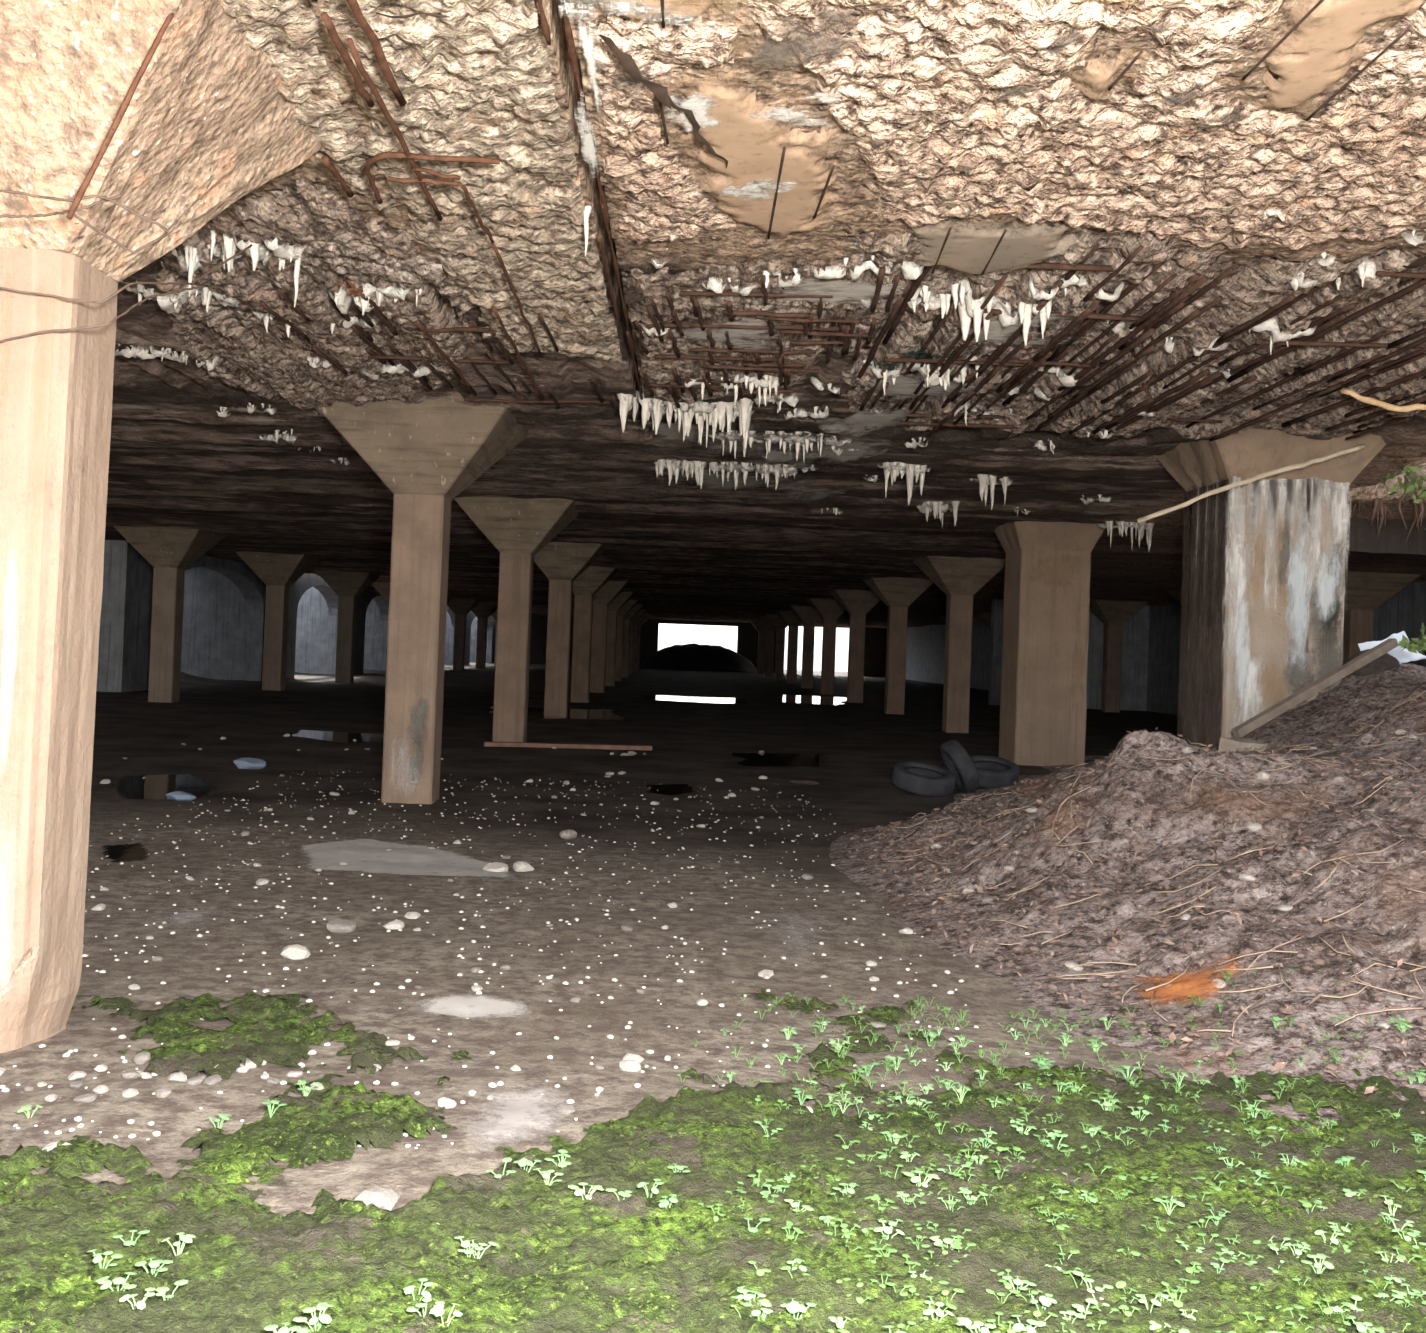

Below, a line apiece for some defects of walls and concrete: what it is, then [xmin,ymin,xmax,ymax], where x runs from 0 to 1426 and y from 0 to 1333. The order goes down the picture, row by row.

rust [537,0,643,400]
spalling [146,0,1426,441]
leakage [114,344,220,371]
leakage [124,229,307,338]
leakage [307,356,332,369]
leakage [323,280,426,334]
leakage [360,363,432,380]
leakage [616,254,1128,526]
leakage [1105,320,1136,334]
leakage [1177,476,1349,748]